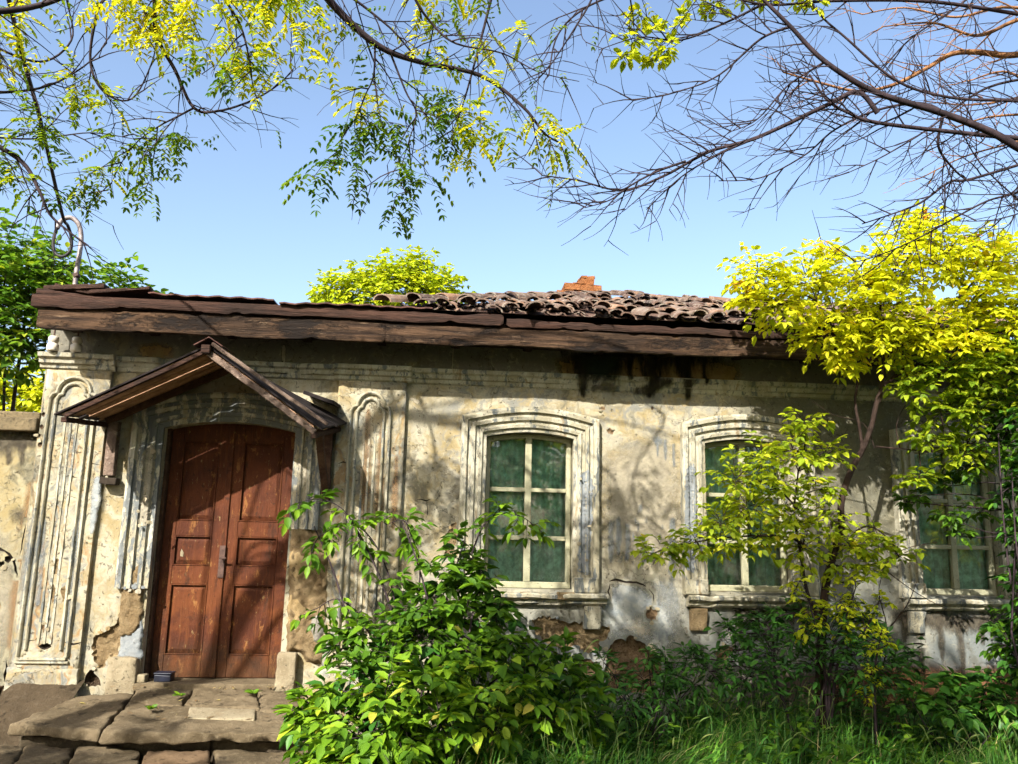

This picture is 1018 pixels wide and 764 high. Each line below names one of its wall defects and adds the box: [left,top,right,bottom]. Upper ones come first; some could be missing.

leakage [575,353,709,400]
leakage [0,432,35,464]
peeling [136,445,157,527]
peeling [532,463,698,698]
crack [607,579,654,601]
spalling [82,617,144,687]